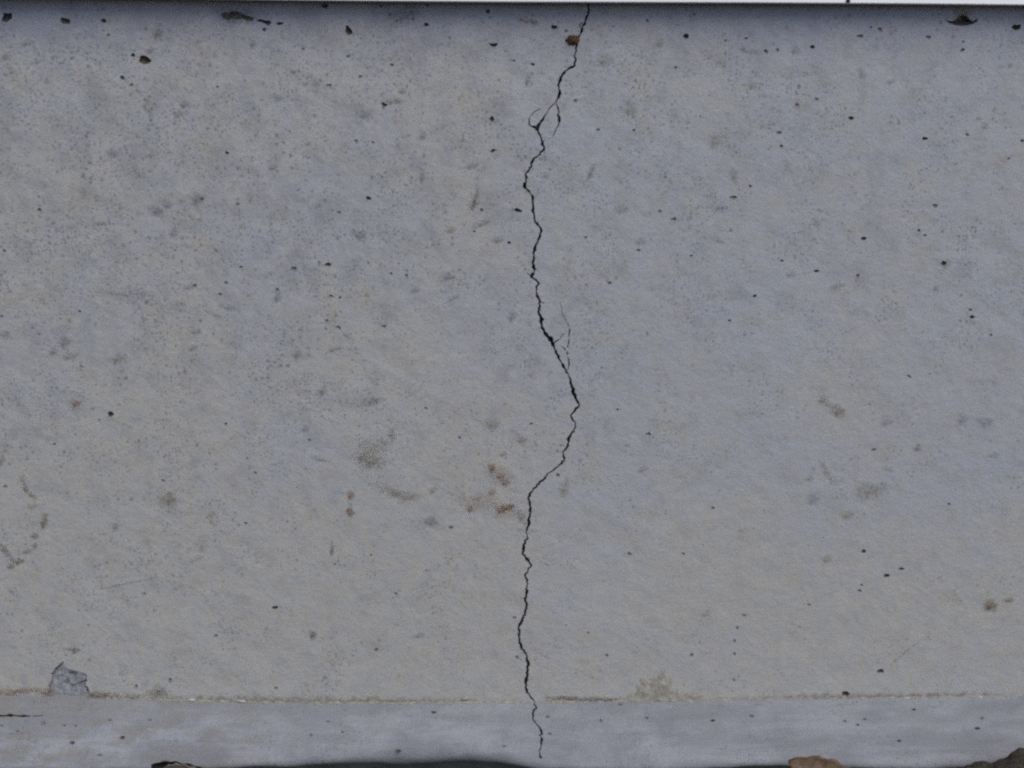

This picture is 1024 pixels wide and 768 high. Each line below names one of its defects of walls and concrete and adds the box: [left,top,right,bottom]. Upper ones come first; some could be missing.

crack [518,4,590,758]